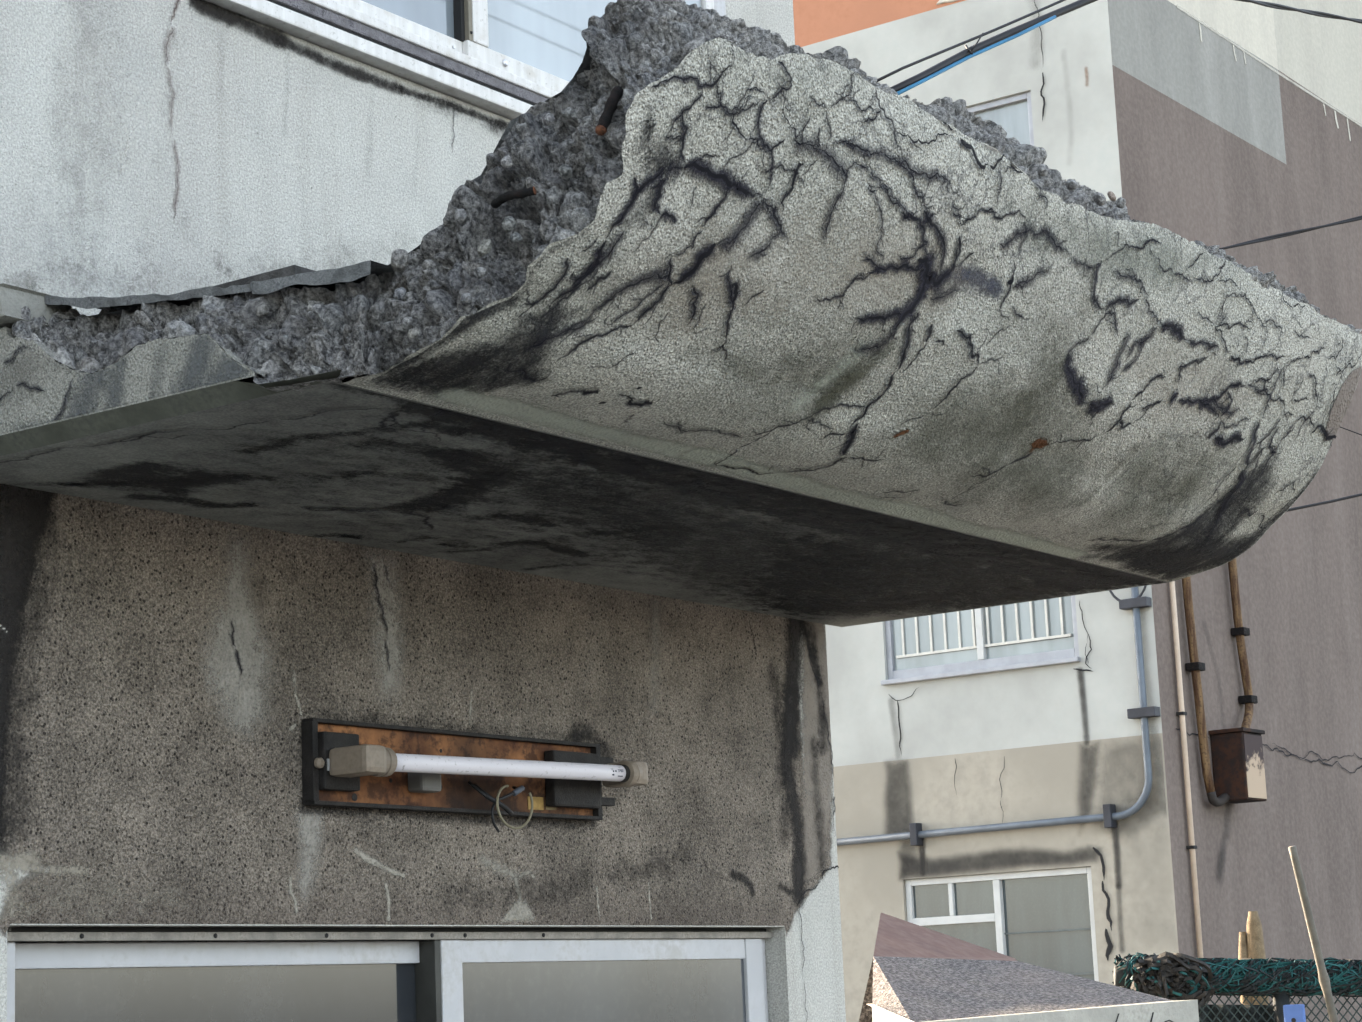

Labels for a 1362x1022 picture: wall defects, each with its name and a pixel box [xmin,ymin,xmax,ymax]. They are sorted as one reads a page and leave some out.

crack [1034,1,1045,121]
spalling [12,0,1149,394]
crack [487,44,1362,552]
spalling [1173,232,1362,333]
crack [0,327,444,463]
crack [231,621,243,673]
crack [374,564,390,671]
leakage [0,296,1317,936]
crack [1075,602,1093,672]
crack [1263,743,1362,773]
crack [1093,847,1113,961]